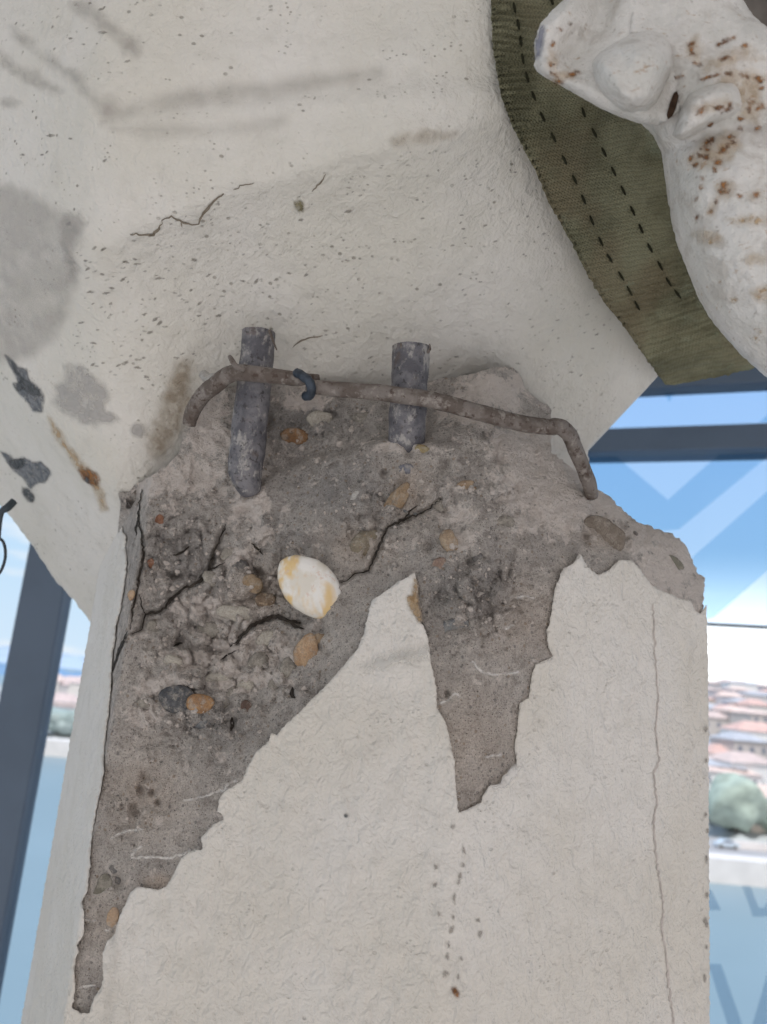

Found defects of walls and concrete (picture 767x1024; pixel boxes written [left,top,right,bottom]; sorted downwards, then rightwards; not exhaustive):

crack [130,183,253,236]
peeling [5,355,43,412]
spalling [239,327,277,368]
spalling [382,342,551,419]
peeling [1,452,50,502]
corrosion [53,426,103,506]
crack [341,499,441,583]
crack [112,489,226,671]
crack [220,614,304,660]
spalling [72,381,705,1013]
crack [652,604,675,1024]